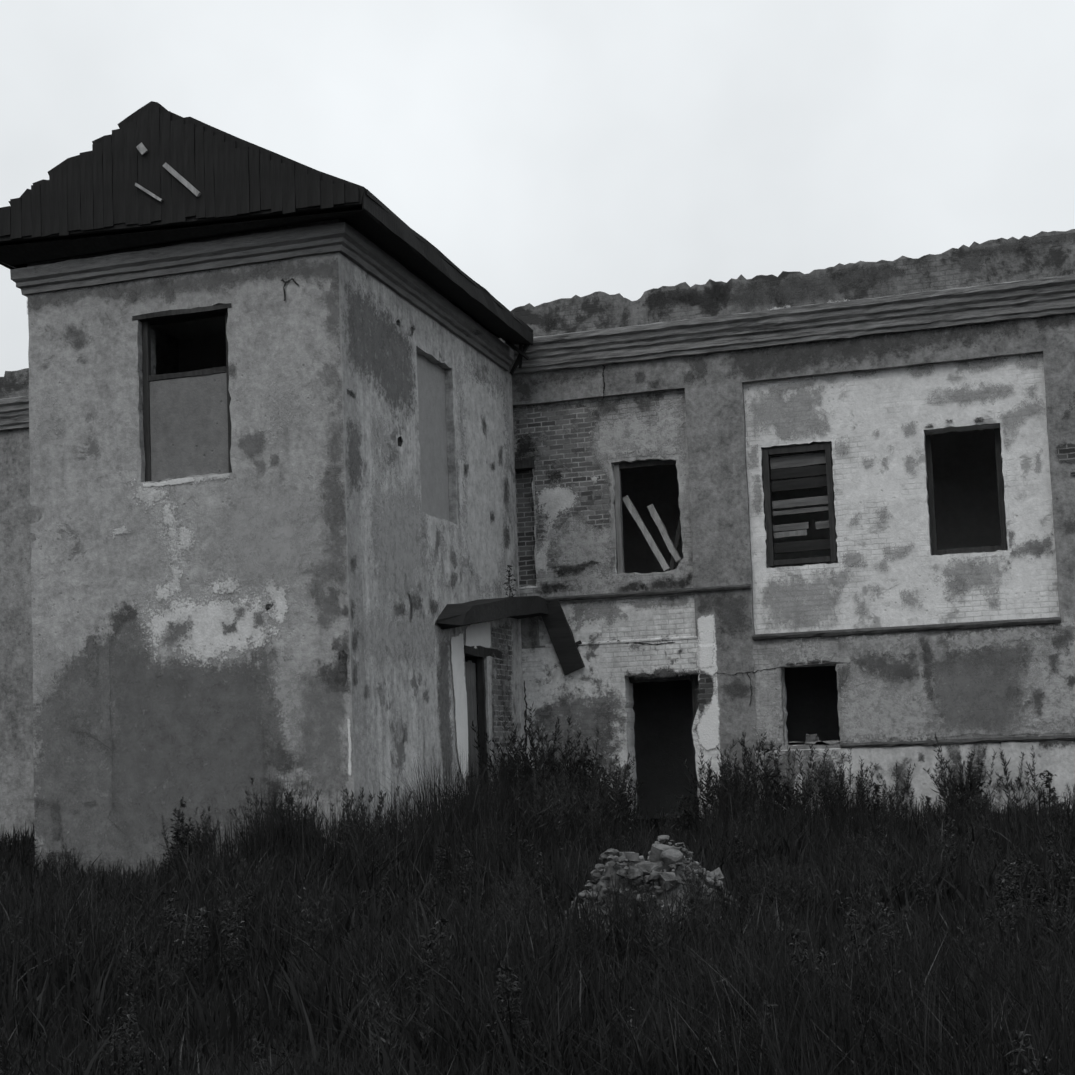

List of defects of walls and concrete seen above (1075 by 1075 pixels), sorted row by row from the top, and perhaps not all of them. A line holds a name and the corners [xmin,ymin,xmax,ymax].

water stain [729,265,904,310]
water stain [962,232,1075,270]
peeling [928,382,1013,404]
water stain [27,258,416,631]
peeling [456,362,611,597]
peeling [745,386,829,512]
flaking render [1035,442,1075,476]
peeling [1008,532,1053,563]
peeling [112,574,290,668]
water stain [838,637,933,701]
water stain [33,600,300,880]
flaking render [524,685,630,778]